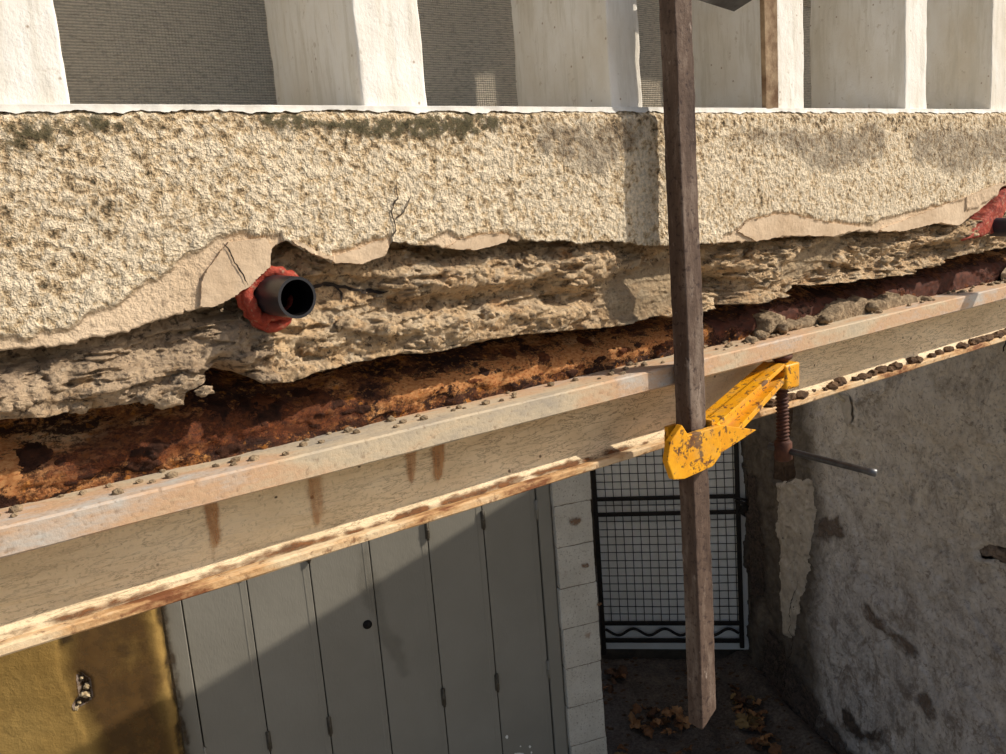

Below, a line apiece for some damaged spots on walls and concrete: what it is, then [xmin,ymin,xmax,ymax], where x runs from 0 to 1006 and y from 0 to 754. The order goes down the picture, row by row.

spalling [0,233,672,420]
corrosion [388,328,671,403]
spalling [700,183,1006,312]
corrosion [703,257,1006,338]
corrosion [0,387,371,496]
flaking render [979,544,1006,563]
water stain [62,605,190,754]